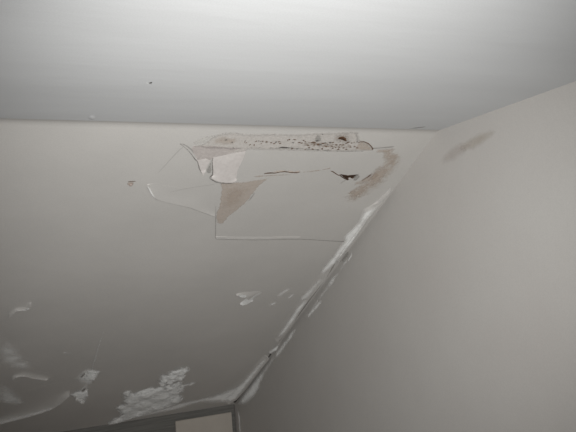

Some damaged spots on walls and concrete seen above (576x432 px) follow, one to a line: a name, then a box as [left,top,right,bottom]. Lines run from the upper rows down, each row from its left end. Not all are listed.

peeling [180,132,373,184]
crack [256,168,330,177]
water stain [217,180,265,223]
peeling [205,188,391,404]
peeling [71,388,88,404]